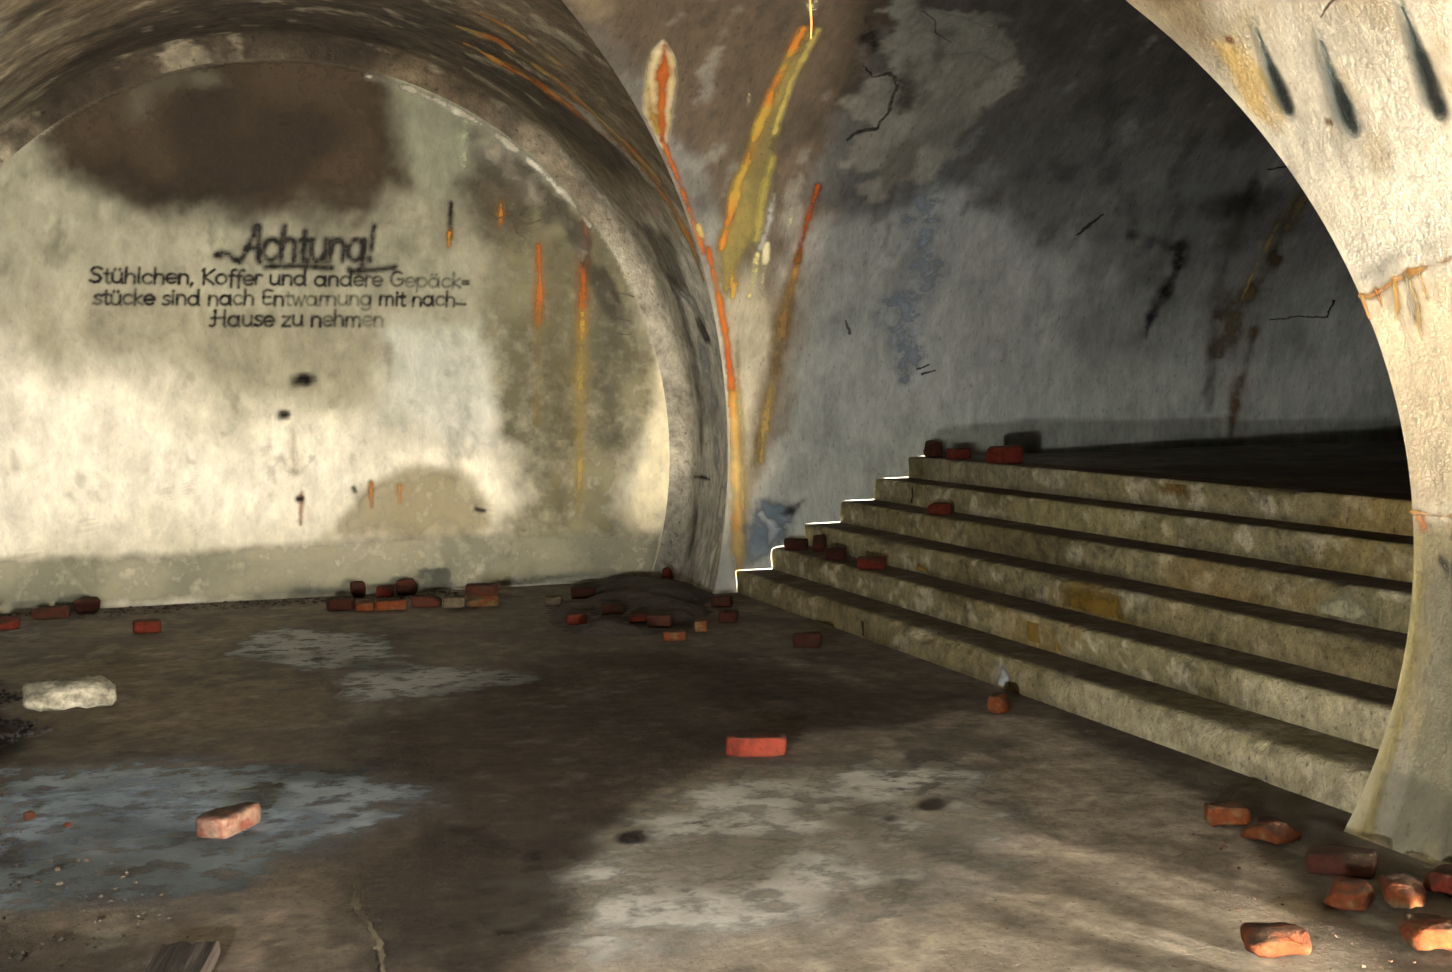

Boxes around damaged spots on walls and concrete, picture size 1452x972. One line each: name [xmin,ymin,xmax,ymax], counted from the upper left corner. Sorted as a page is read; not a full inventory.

damp [1254,18,1294,115]
damp [1321,41,1359,133]
damp [1401,7,1448,119]
damp [0,61,658,606]
rust [455,13,821,572]
damp [1127,232,1187,336]
damp [1209,190,1308,358]
rust [1358,258,1452,335]
damp [1228,372,1245,436]